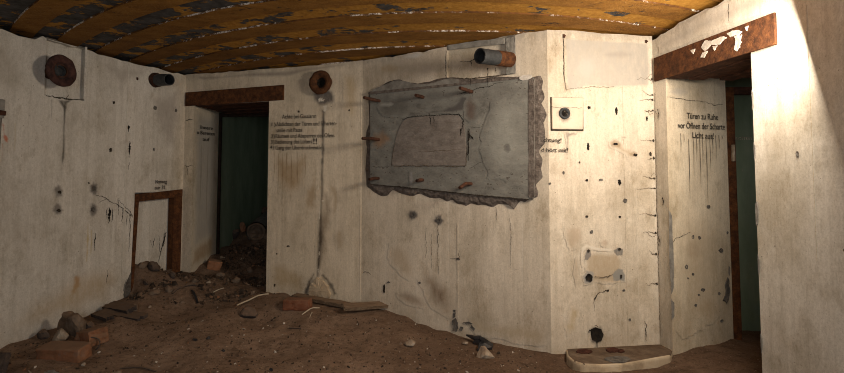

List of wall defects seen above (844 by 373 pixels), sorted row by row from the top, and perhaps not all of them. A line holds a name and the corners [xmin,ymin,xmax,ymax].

peeling [691,26,749,58]
damp [268,261,304,293]
damp [271,108,343,278]
damp [673,133,727,339]